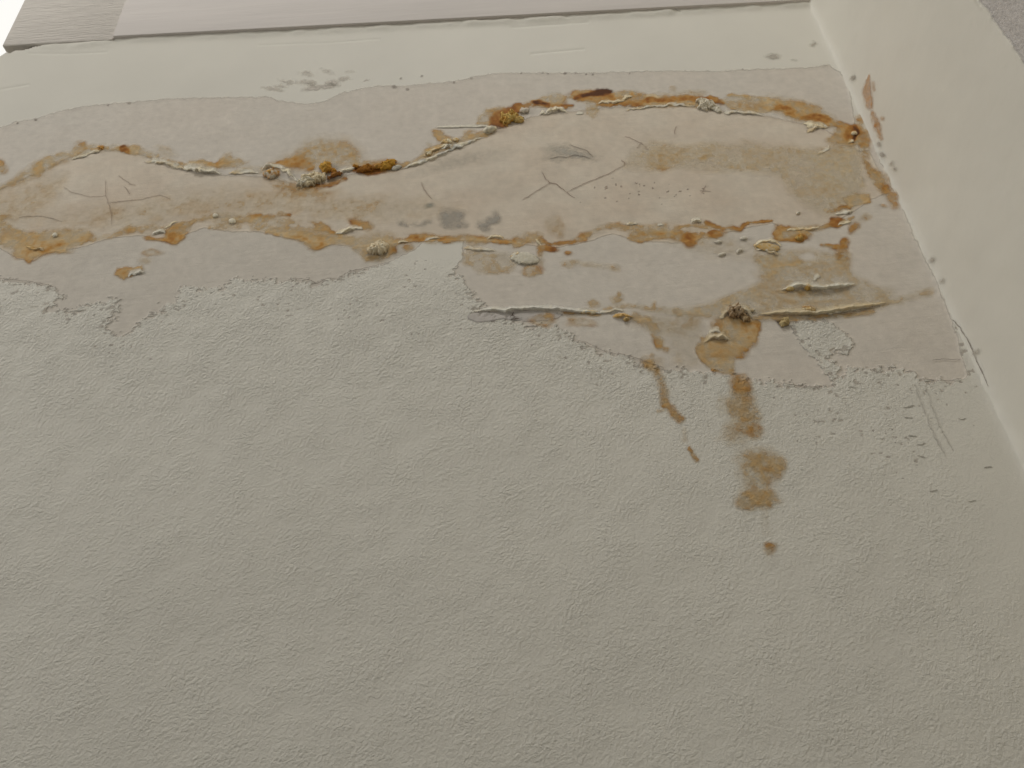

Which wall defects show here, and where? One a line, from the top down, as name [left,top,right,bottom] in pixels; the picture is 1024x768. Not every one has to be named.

peeling [0,65,855,189]
crack [526,136,648,198]
peeling [0,228,421,346]
damp [0,75,902,437]
peeling [449,135,976,399]
damp [737,452,786,510]